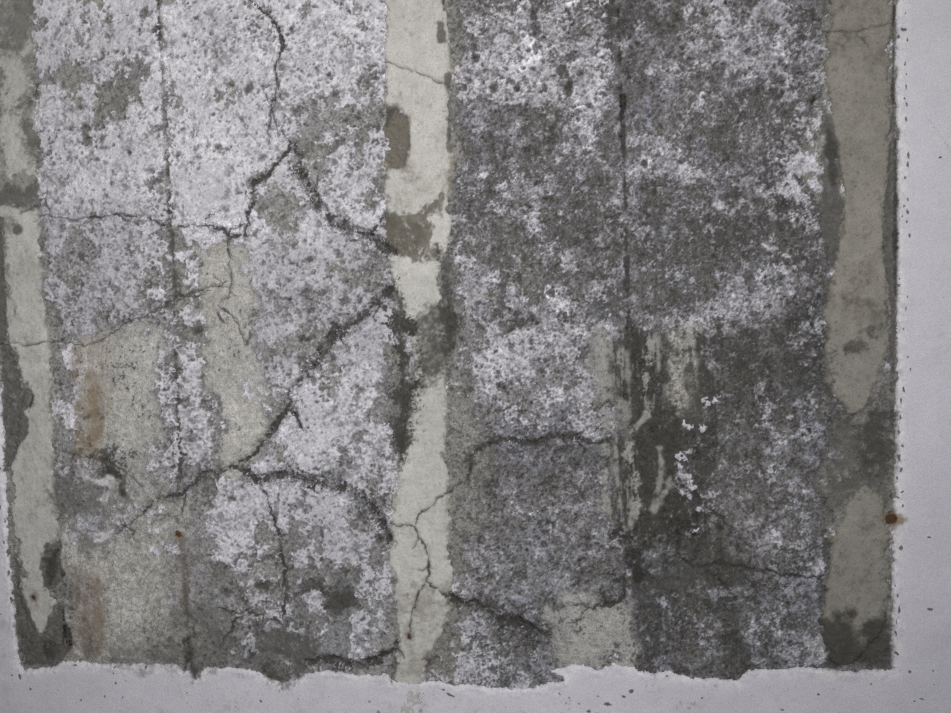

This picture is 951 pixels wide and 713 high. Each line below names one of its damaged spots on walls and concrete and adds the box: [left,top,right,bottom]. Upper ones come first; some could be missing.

peeling [452,0,614,113]
peeling [644,0,820,113]
crack [43,3,398,346]
peeling [32,0,410,497]
flaking render [882,62,911,372]
flaking render [0,230,33,471]
peeling [471,318,615,439]
flaking render [3,540,72,667]
peeling [210,476,390,635]
crack [117,285,621,682]
crack [561,483,814,623]
rust [883,511,905,526]